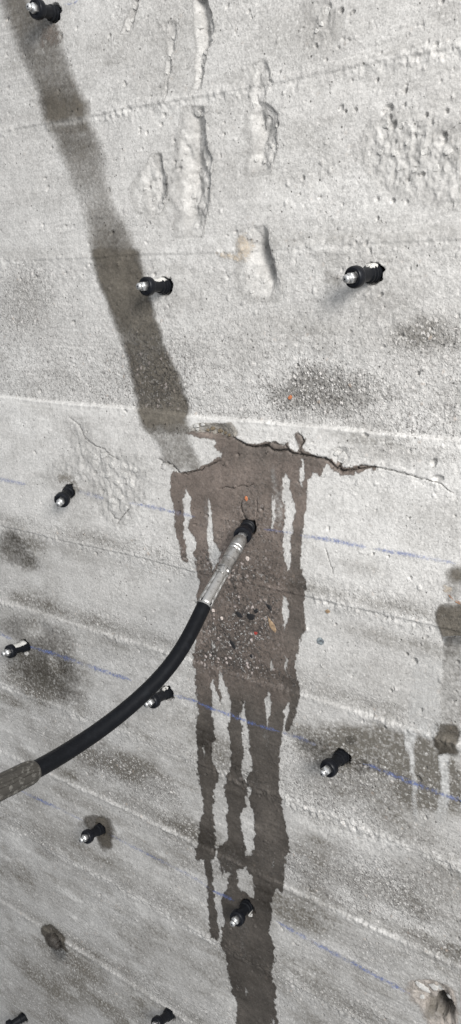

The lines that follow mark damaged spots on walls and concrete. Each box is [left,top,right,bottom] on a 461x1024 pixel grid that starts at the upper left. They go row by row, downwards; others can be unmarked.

water stain [6,0,96,178]
crack [241,439,448,490]
water stain [449,568,461,582]
water stain [92,215,377,1024]
water stain [436,604,461,646]
water stain [404,662,459,821]
spalling [407,979,458,1024]